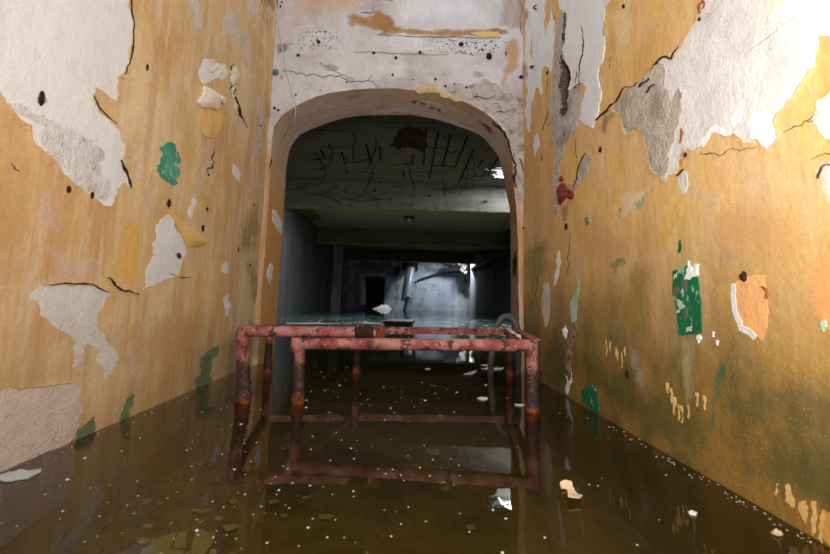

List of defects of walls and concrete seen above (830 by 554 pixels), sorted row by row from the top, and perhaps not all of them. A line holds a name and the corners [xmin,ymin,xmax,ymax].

flaking render [0,0,141,212]
flaking render [186,0,203,36]
peeling [197,8,252,138]
crack [282,62,380,87]
peeling [348,11,507,37]
crack [355,34,501,55]
flaking render [414,0,830,212]
peeling [157,142,181,186]
peeling [619,187,648,219]
flaking render [143,197,208,290]
peeling [731,274,769,342]
flaking render [0,276,119,482]